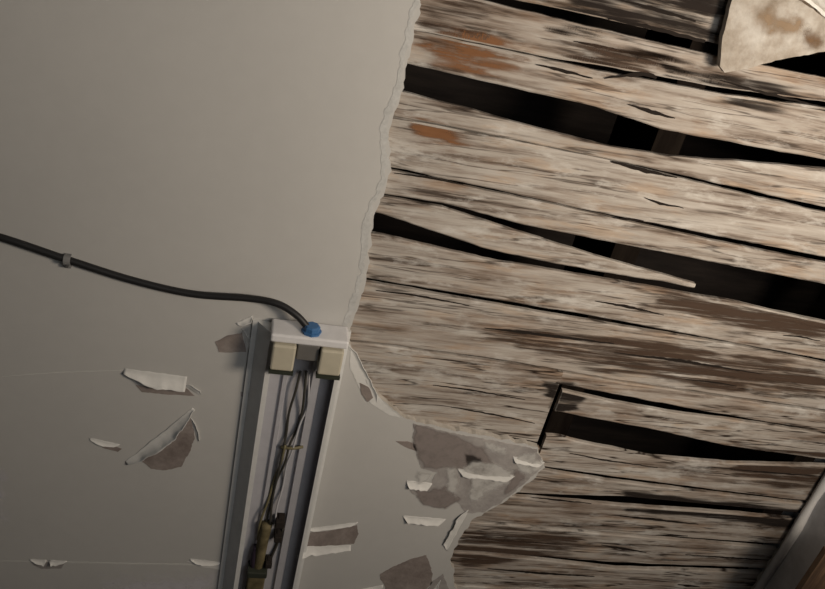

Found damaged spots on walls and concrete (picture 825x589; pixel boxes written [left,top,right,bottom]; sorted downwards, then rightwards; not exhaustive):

flaking render [717,0,825,73]
peeling [342,0,420,327]
peeling [215,316,253,353]
peeling [123,368,201,396]
peeling [348,346,399,417]
peeling [89,438,121,452]
peeling [125,408,199,470]
peeling [396,423,545,551]
peeling [364,555,449,589]